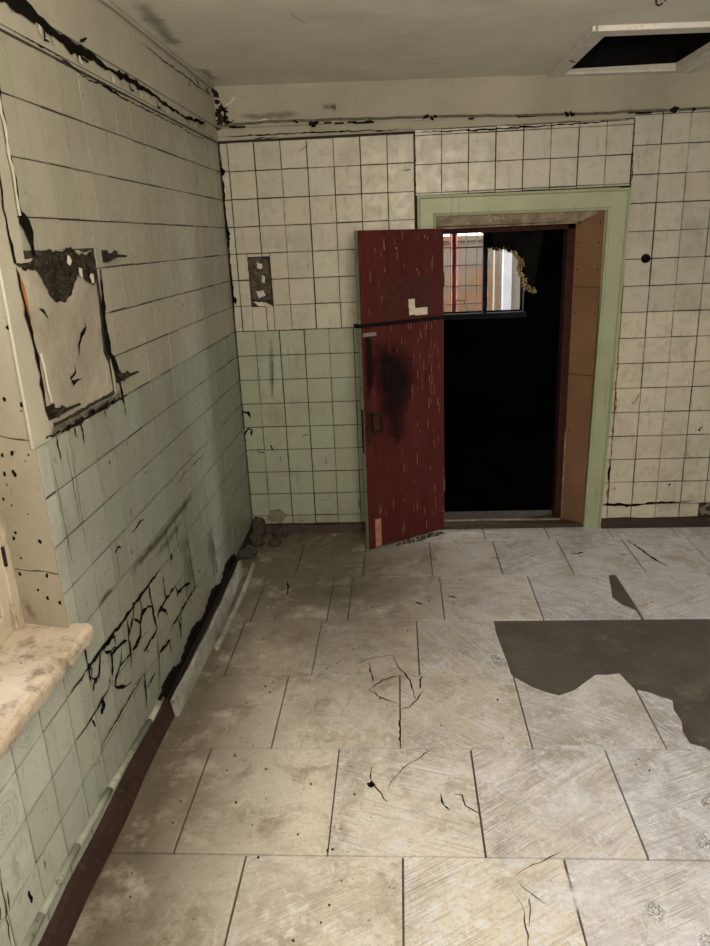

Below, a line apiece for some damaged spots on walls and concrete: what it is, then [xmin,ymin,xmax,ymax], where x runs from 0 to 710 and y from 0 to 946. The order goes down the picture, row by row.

flaking render [16,247,124,435]
crack [71,570,197,748]
crack [360,655,429,802]
crack [441,794,480,814]
crack [512,851,562,946]